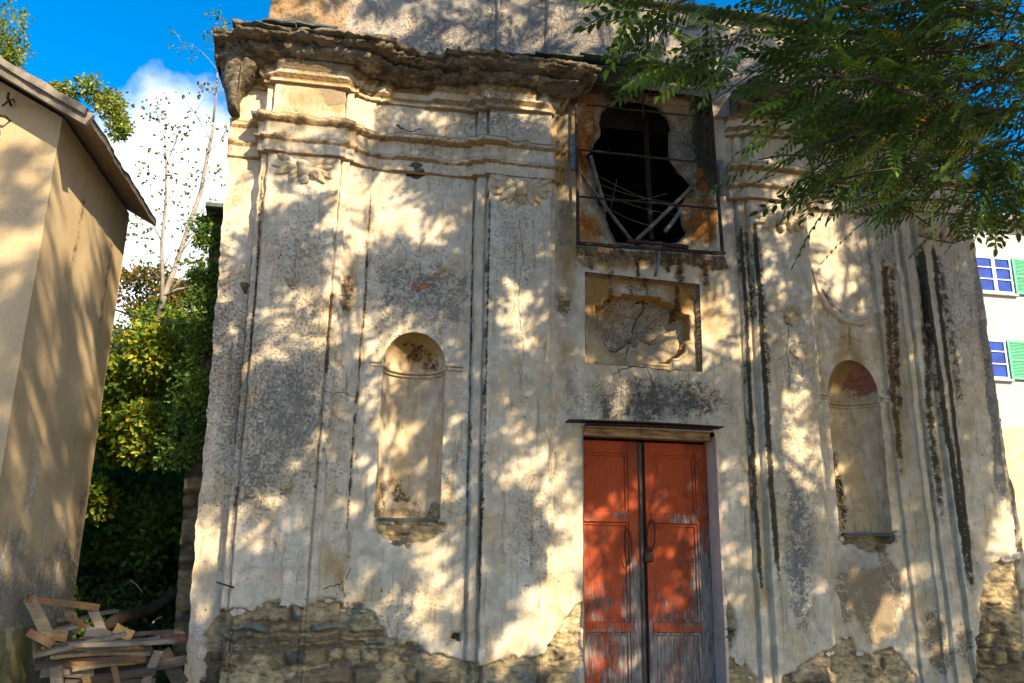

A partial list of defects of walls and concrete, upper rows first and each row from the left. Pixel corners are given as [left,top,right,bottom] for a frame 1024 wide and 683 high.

peeling [319,87,347,106]
peeling [555,101,729,269]
corrosion [683,167,717,242]
crack [605,277,712,415]
leakage [601,376,723,421]
leakage [737,222,780,589]
leakage [844,260,903,473]
leakage [916,247,975,585]
spalling [200,598,582,683]
spalling [782,531,916,683]
spalling [922,419,1024,683]